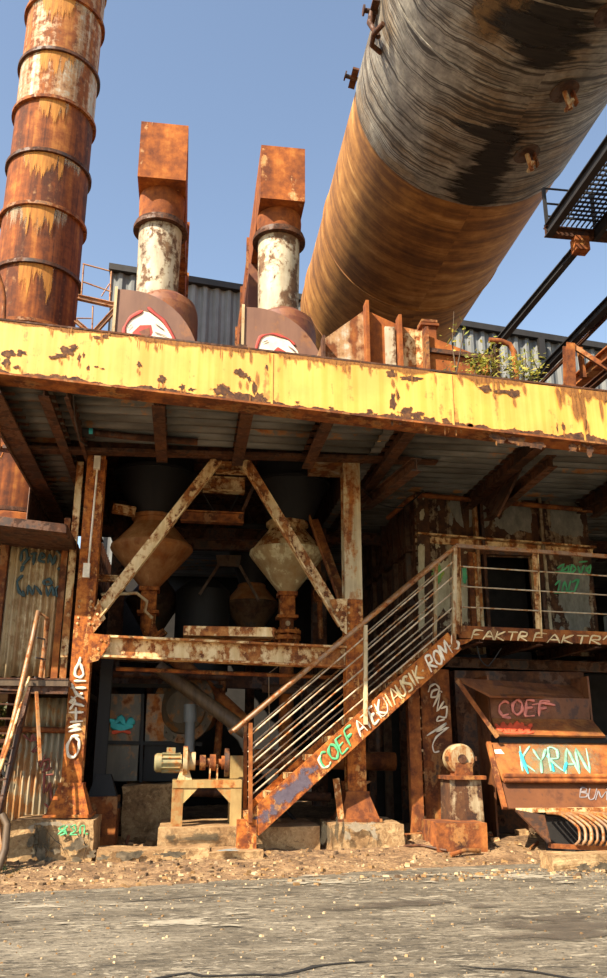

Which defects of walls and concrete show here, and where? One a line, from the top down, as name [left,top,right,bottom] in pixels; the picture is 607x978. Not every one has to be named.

rust [0,92,607,458]
crack [154,960,401,978]